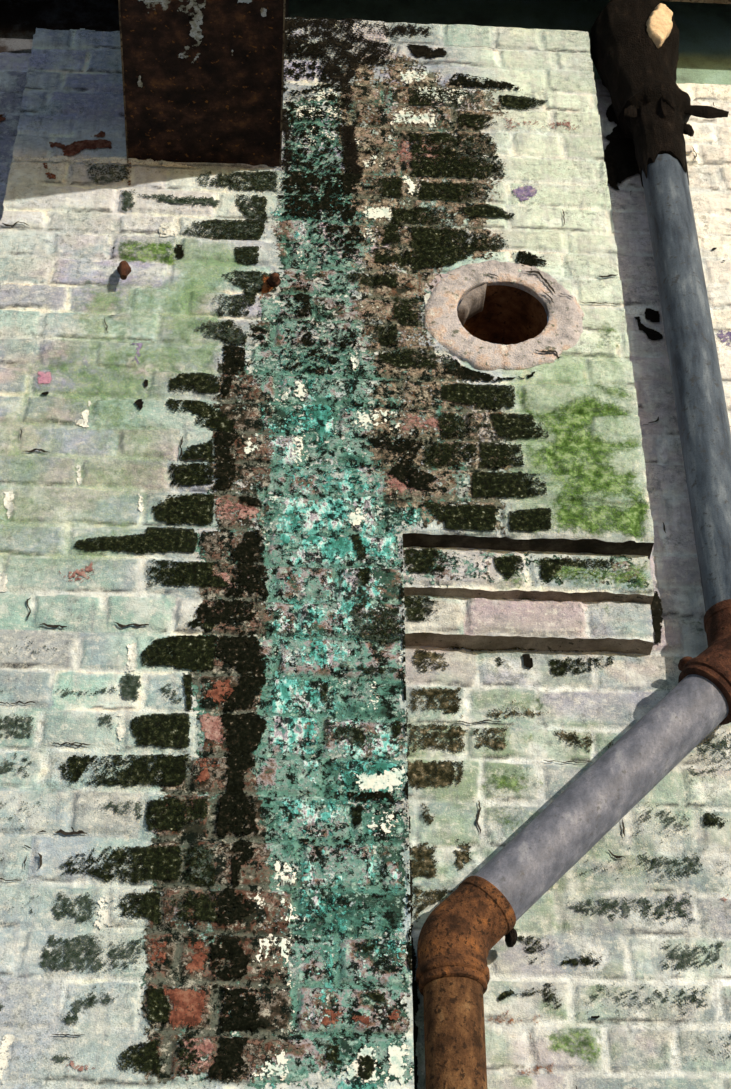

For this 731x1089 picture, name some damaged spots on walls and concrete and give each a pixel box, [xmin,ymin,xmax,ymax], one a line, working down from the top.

damp [407,44,447,58]
damp [86,164,220,212]
damp [184,194,268,240]
damp [234,245,261,265]
damp [513,251,549,270]
damp [213,270,272,317]
peeling [385,472,420,496]
peeling [215,498,259,520]
damp [508,508,552,532]
damp [55,673,141,701]
damp [130,713,191,749]
peeling [320,1008,370,1029]